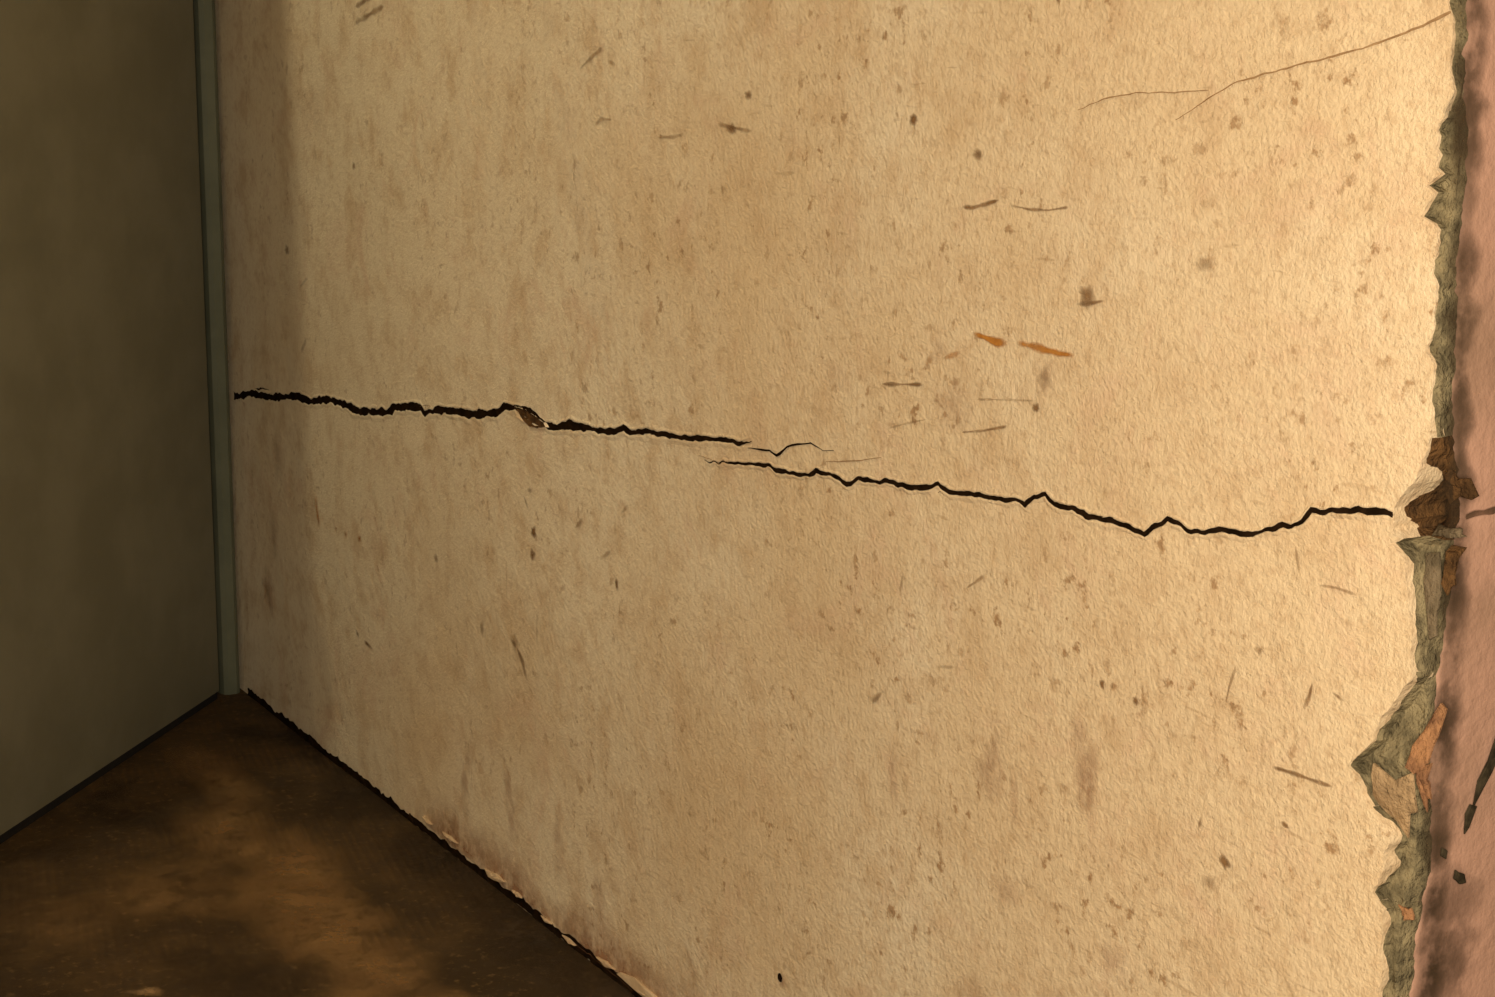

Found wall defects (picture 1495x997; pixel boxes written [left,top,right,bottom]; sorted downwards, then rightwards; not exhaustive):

crack [234,387,1394,543]
spalling [1348,0,1479,997]
crack [1466,507,1495,519]